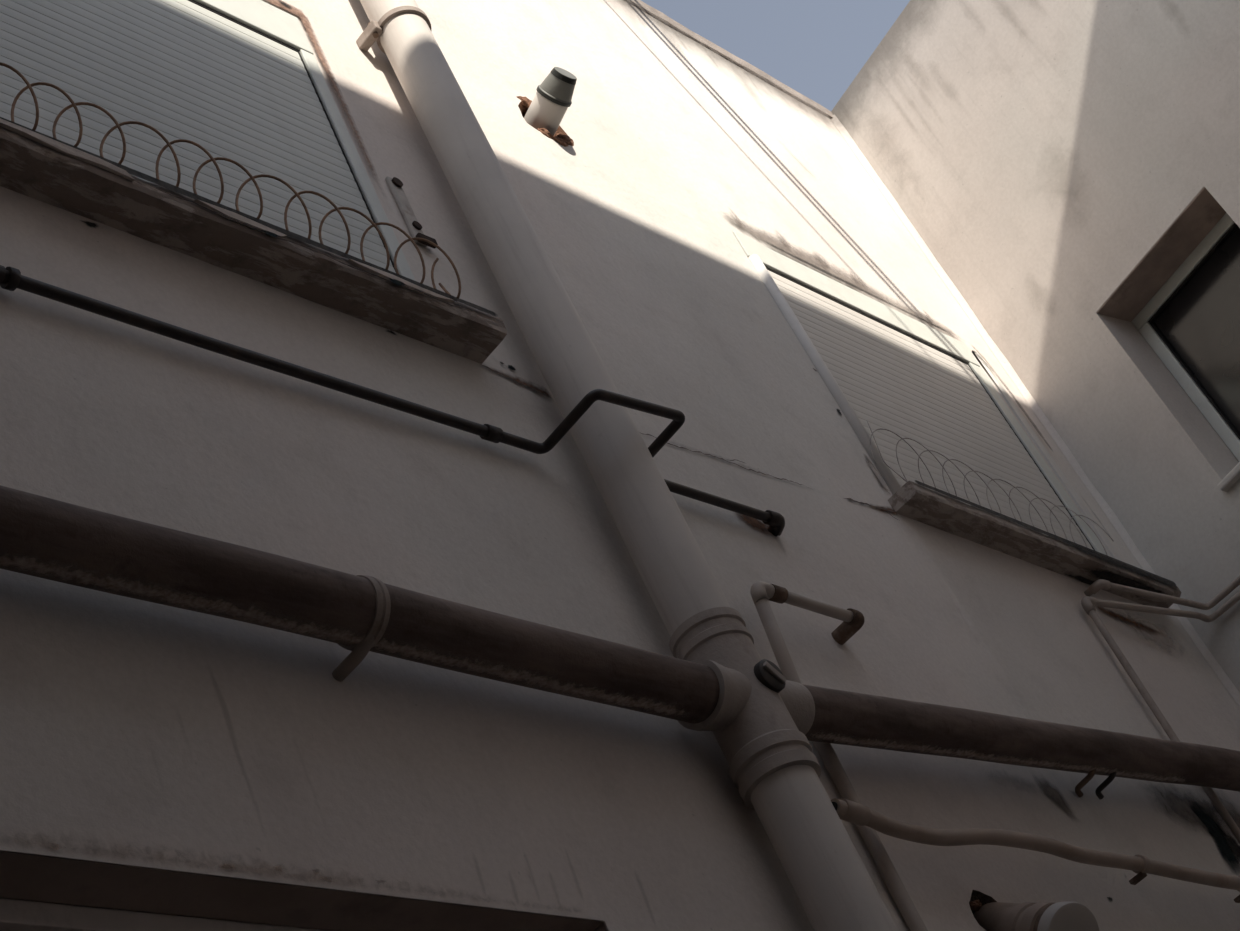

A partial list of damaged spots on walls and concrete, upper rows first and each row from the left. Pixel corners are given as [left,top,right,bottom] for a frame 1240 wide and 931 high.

flaking render [516,96,532,118]
flaking render [537,125,574,147]
crack [641,433,805,486]
crack [844,498,900,521]
damp [1155,787,1240,870]